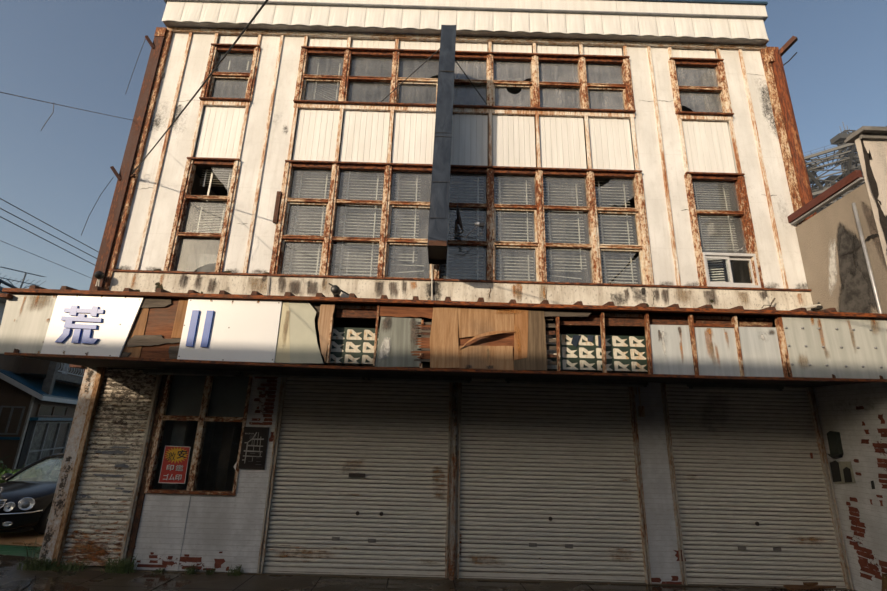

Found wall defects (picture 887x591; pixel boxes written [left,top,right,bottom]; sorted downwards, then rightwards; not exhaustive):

leakage [863,202,884,261]
leakage [278,277,327,294]
leakage [375,280,406,296]
leakage [426,281,442,300]
leakage [829,223,876,313]
peeling [861,414,887,506]
peeling [137,551,229,571]
peeling [846,497,887,581]